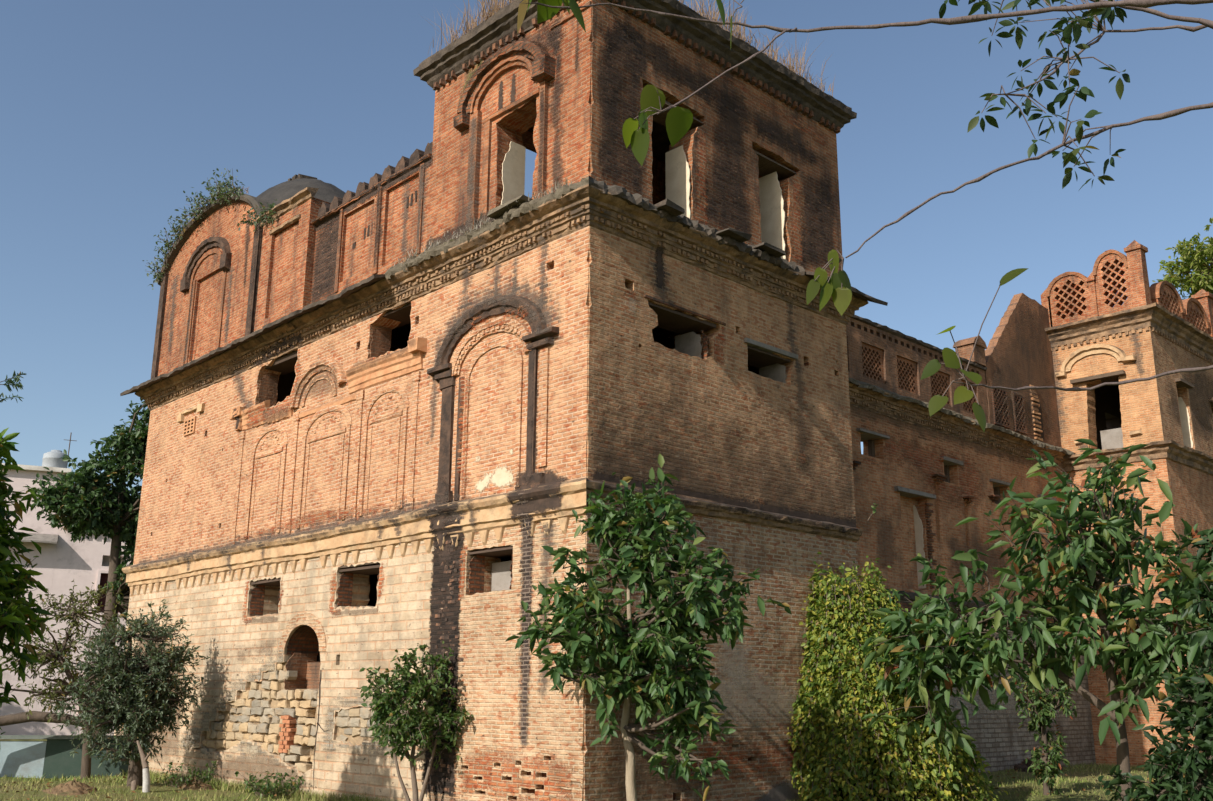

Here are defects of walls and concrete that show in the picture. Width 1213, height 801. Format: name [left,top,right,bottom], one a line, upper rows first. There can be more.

flaking render [457,367,514,492]
leakage [130,477,480,800]
spalling [459,746,572,801]